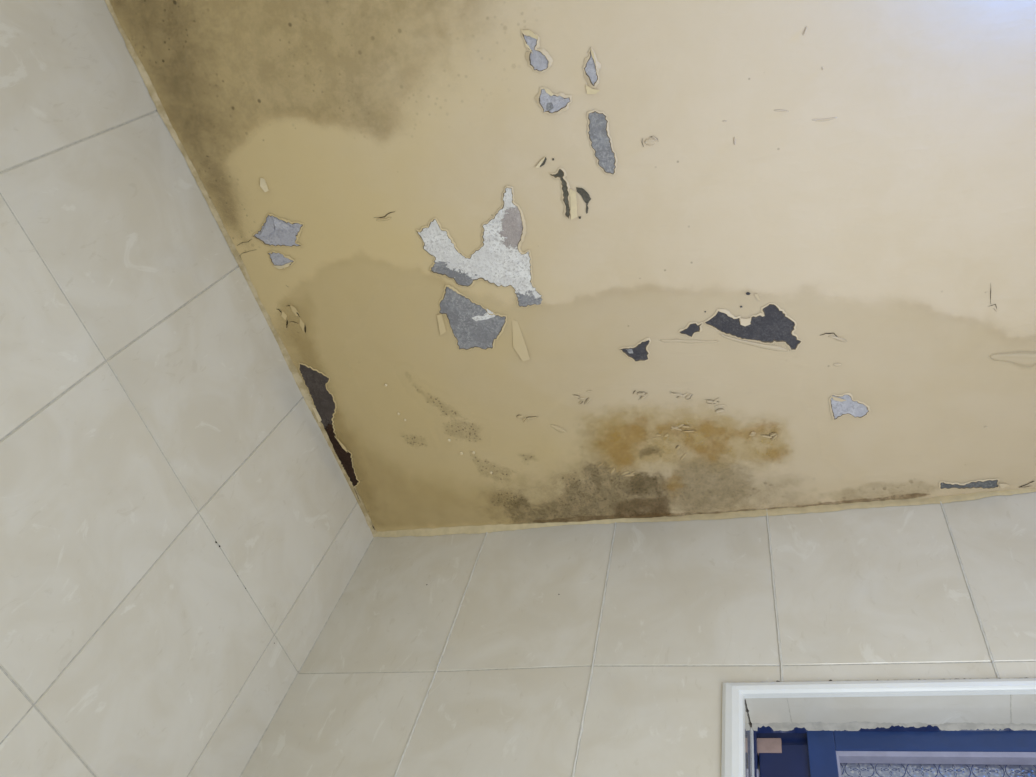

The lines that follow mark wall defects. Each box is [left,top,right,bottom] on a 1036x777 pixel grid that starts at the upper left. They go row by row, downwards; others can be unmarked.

peeling [520,29,553,73]
peeling [582,47,601,94]
peeling [535,87,572,115]
peeling [586,109,618,176]
peeling [535,157,591,220]
peeling [252,213,304,270]
peeling [415,185,543,362]
peeling [618,337,651,362]
peeling [678,292,802,351]
peeling [298,363,360,487]
peeling [829,393,871,420]
peeling [938,478,1010,490]